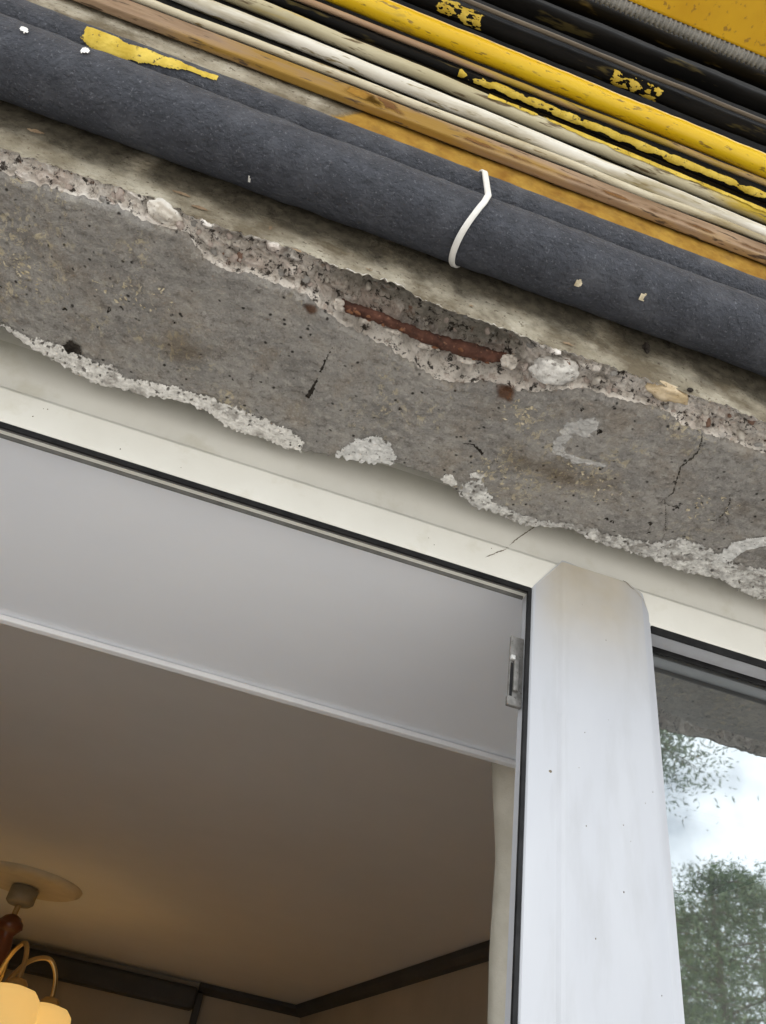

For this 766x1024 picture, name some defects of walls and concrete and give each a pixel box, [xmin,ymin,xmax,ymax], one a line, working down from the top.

spalling [0,148,766,453]
peeling [335,435,398,465]
peeling [551,408,629,502]
peeling [440,443,766,600]
crack [662,433,703,535]